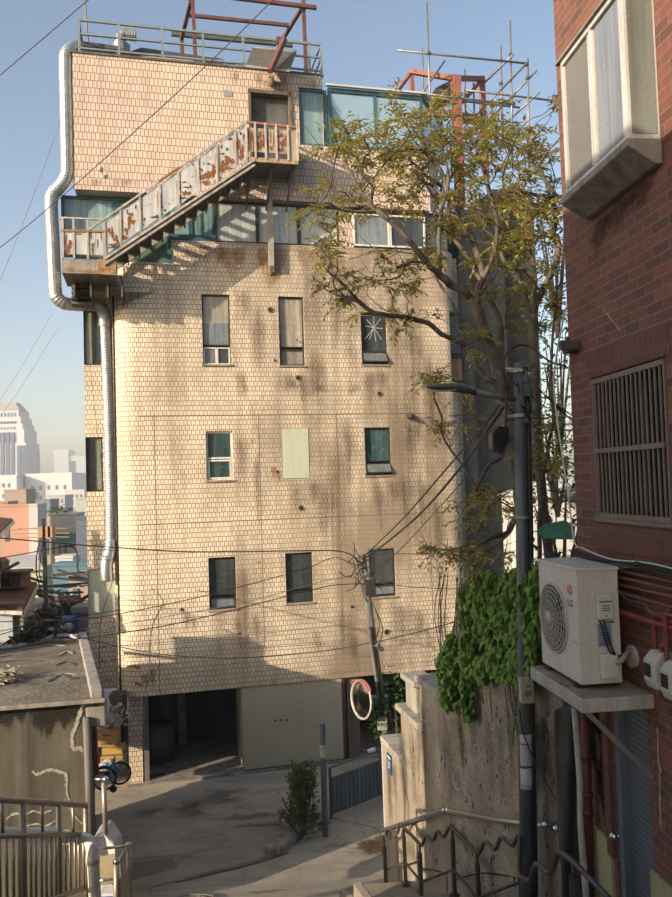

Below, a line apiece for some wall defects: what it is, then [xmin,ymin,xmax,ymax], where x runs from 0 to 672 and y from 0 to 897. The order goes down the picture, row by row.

crack [0,644,87,682]
damp [0,705,81,735]
crack [70,704,85,752]
crack [7,768,83,827]